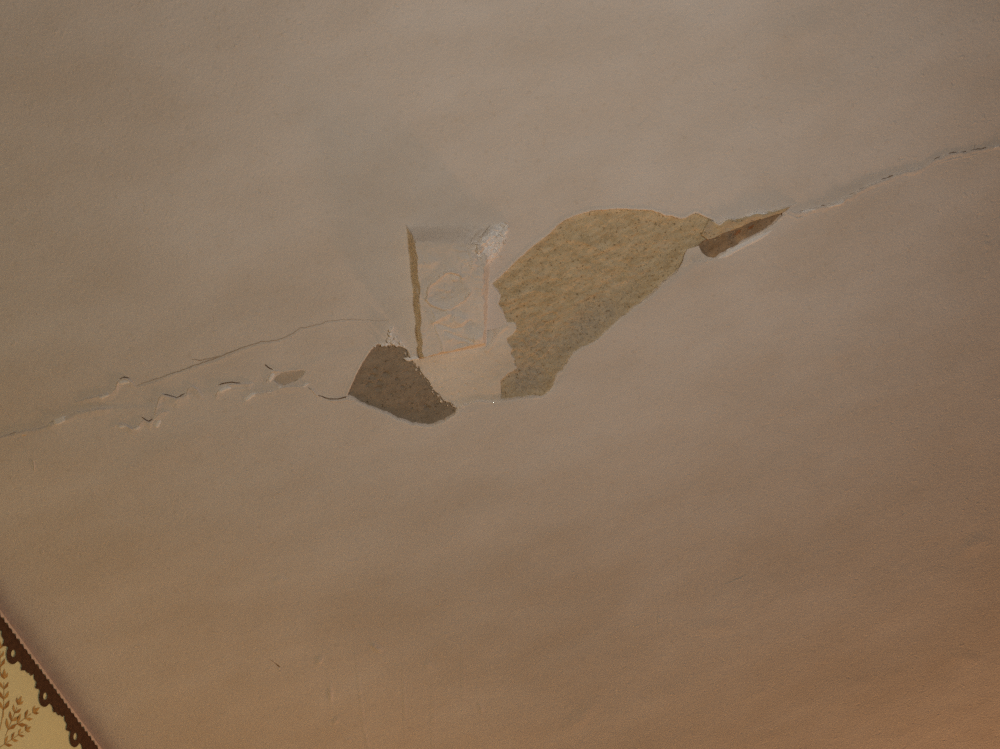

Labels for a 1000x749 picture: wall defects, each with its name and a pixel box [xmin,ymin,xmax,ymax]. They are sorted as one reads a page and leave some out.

spalling [345,204,796,428]
crack [698,209,788,263]